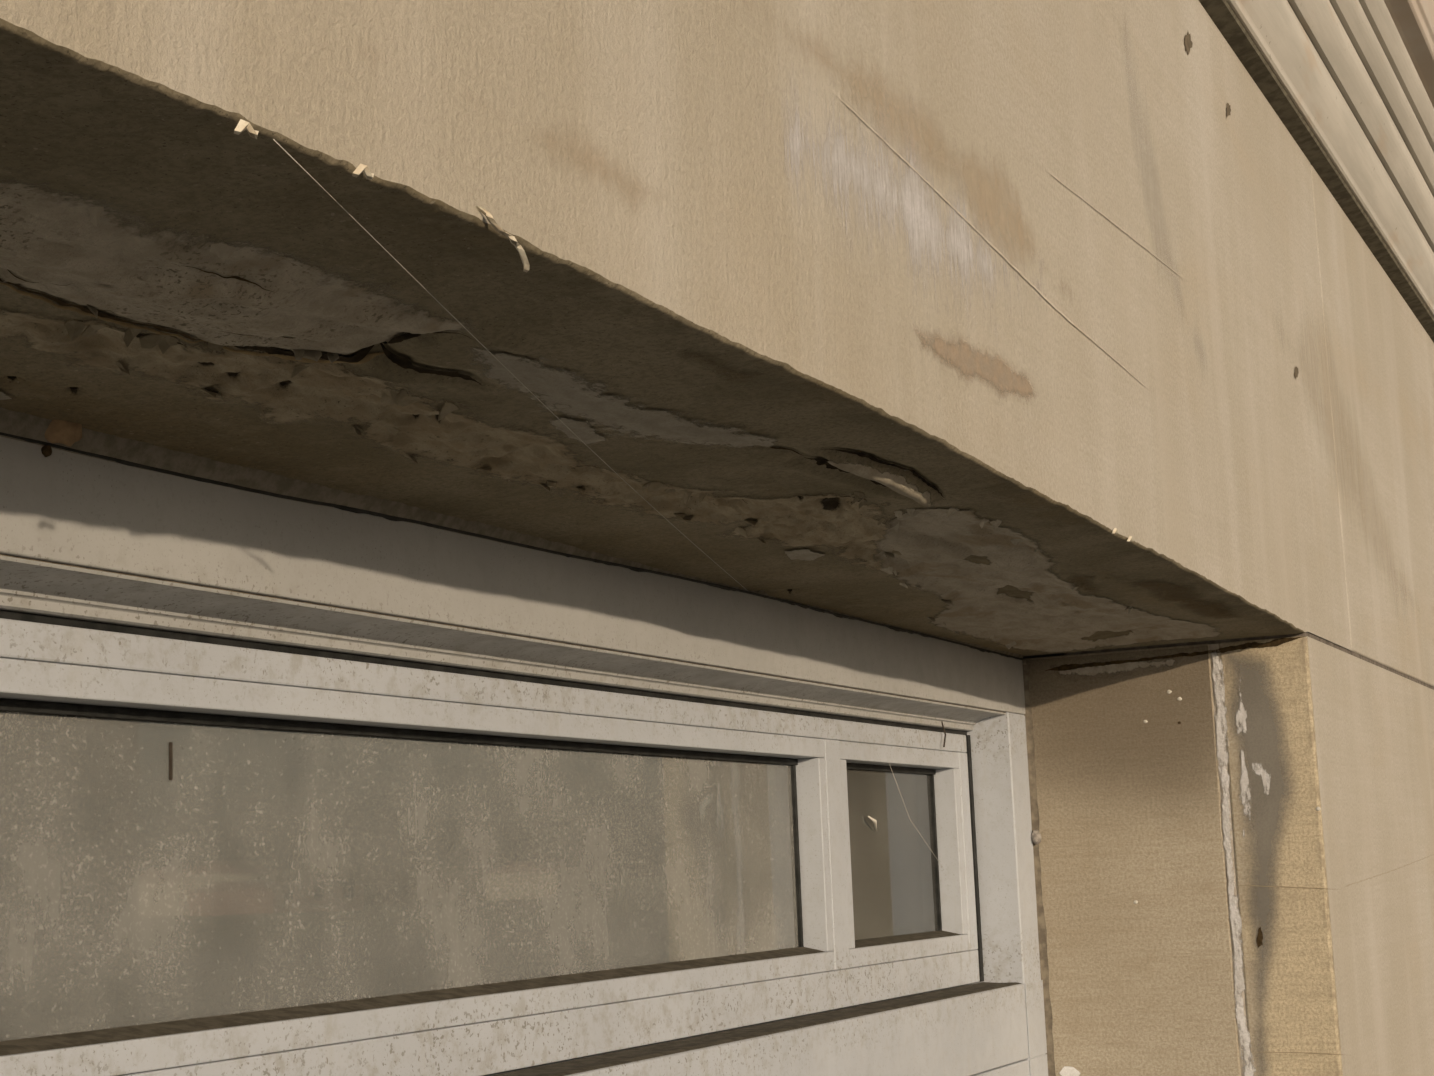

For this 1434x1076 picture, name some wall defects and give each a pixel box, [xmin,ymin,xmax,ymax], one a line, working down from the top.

spalling [1184,33,1193,54]
peeling [234,119,259,139]
peeling [352,163,374,180]
crack [171,263,276,293]
crack [0,269,480,384]
spalling [0,182,1221,653]
peeling [1058,659,1175,676]
water stain [1211,652,1288,1076]